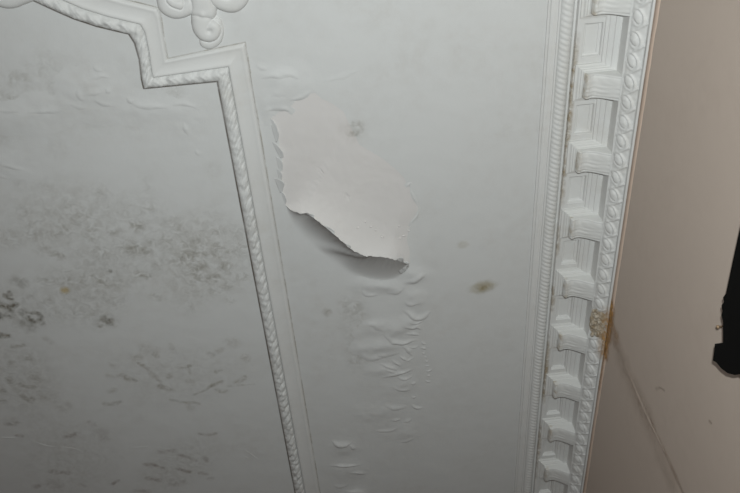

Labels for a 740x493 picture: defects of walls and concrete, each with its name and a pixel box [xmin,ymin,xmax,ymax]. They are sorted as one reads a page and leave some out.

peeling [270,93,422,281]